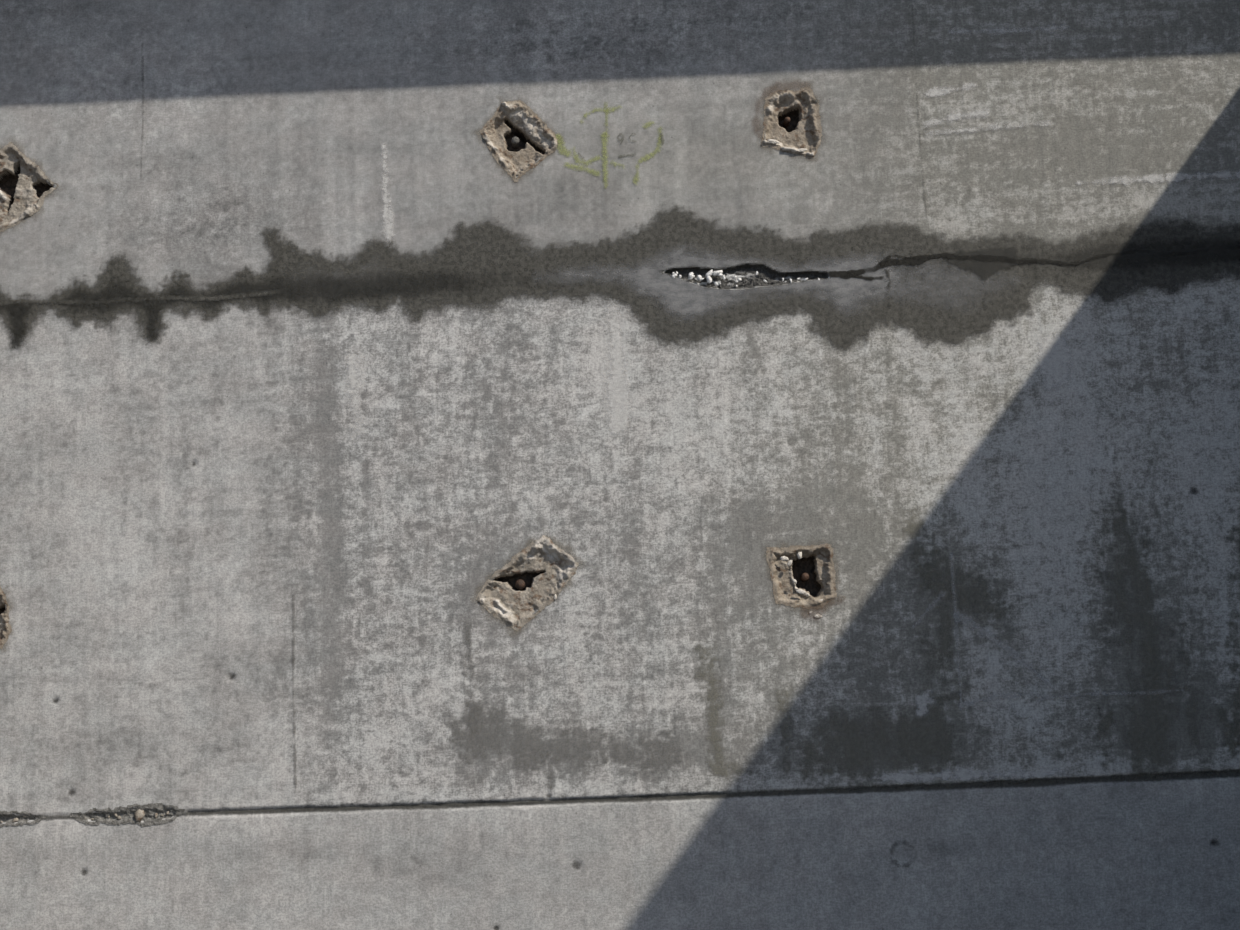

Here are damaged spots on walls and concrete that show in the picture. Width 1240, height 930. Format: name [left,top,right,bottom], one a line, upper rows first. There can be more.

damp [926,84,976,97]
damp [926,110,1012,133]
damp [0,145,1240,434]
crack [662,248,1132,307]
peeling [780,552,806,595]
damp [802,690,1062,783]